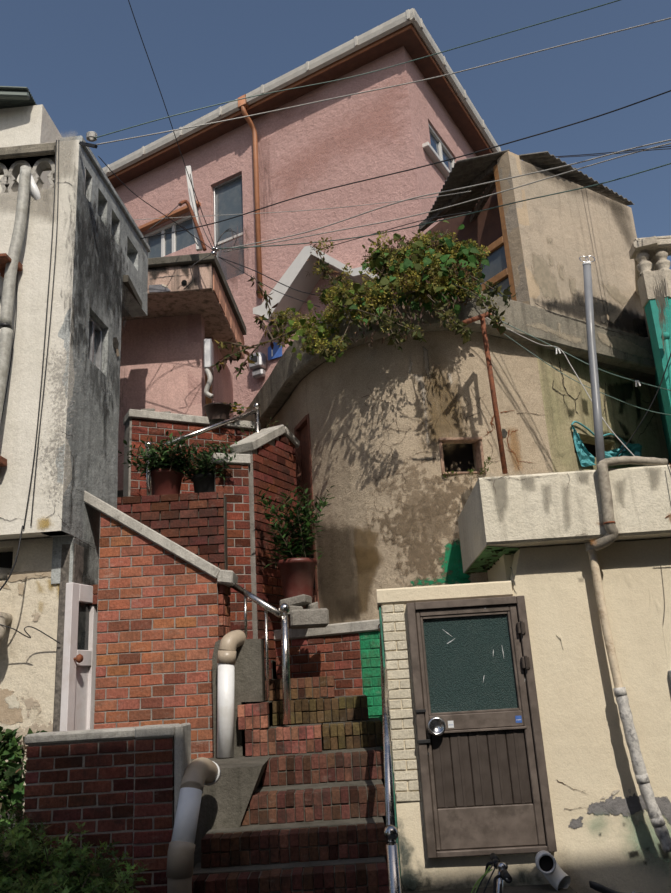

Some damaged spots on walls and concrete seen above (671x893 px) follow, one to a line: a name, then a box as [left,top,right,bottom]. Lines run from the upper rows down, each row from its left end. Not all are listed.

leakage [527,254,654,360]
crack [549,358,580,416]
crack [335,382,582,582]
flaking render [0,688,53,760]
peeling [569,790,647,829]
peeling [655,796,671,824]